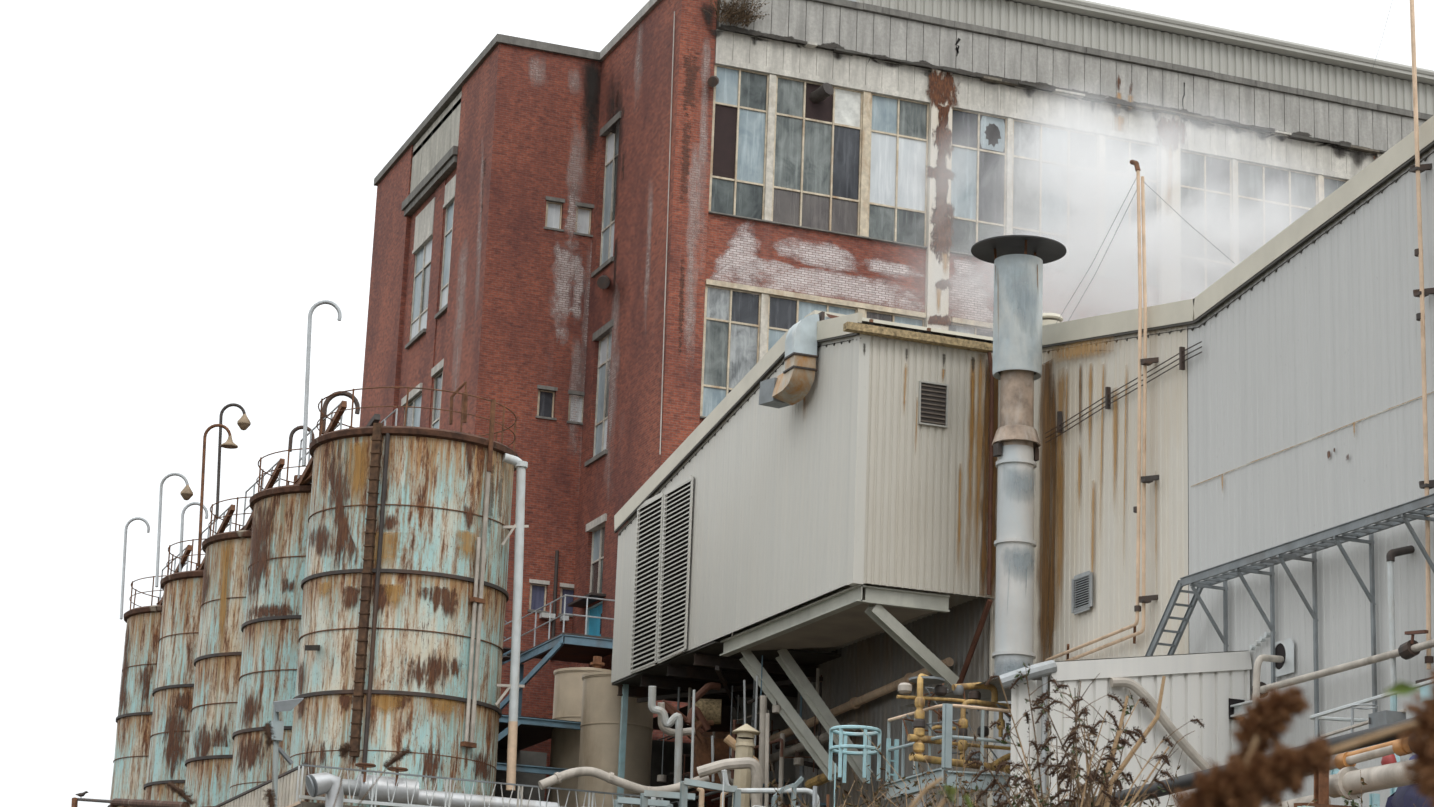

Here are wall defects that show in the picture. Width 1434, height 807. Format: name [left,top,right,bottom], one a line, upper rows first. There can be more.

corrosion [926,69,960,326]
efflorescence [713,226,925,310]
efflorescence [553,249,591,424]
corrosion [247,490,299,618]
corrosion [308,440,396,569]
corrosion [419,586,457,617]
corrosion [1037,342,1127,662]
corrosion [118,621,153,725]
corrosion [162,692,268,779]
corrosion [301,741,326,802]
corrosion [376,654,462,713]
corrosion [420,741,443,784]